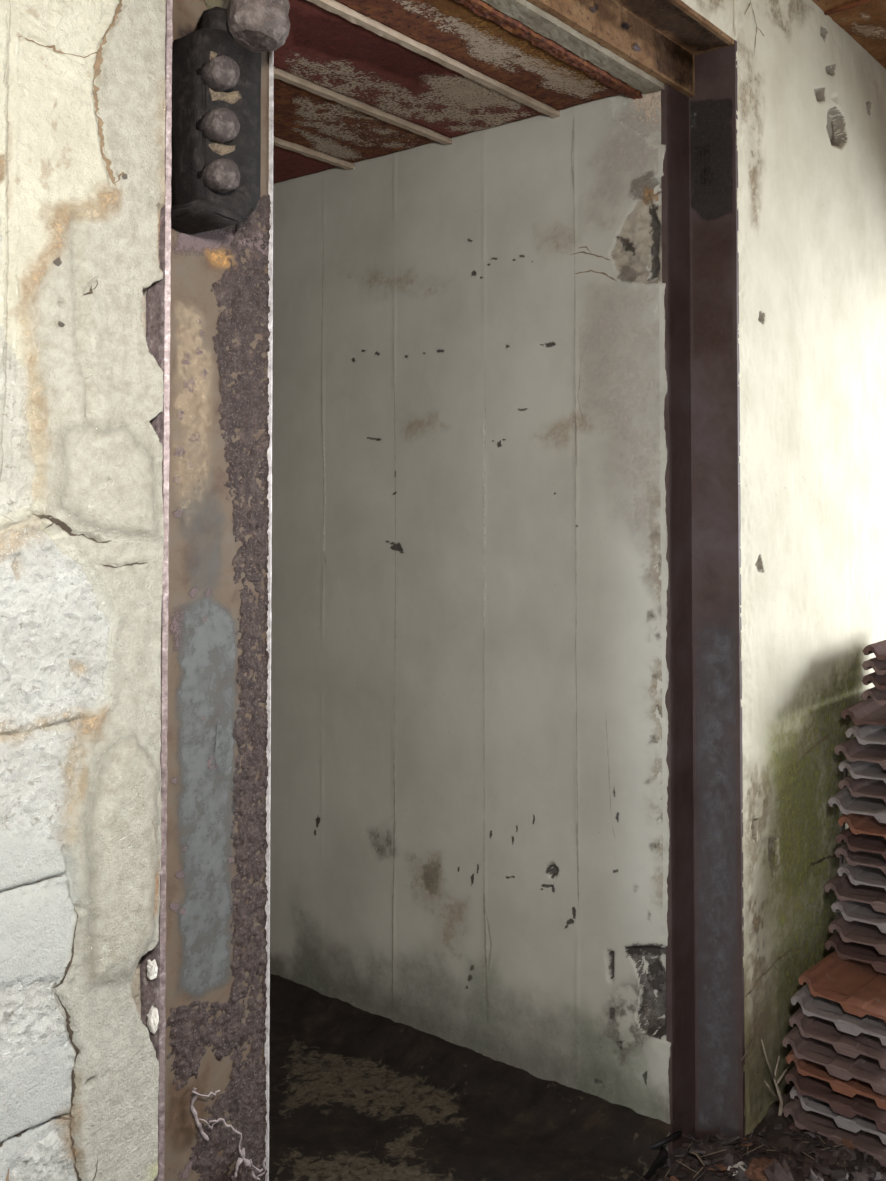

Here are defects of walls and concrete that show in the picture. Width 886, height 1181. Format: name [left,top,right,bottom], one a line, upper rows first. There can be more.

crack [18,0,125,186]
rust [433,1,604,88]
rust [579,0,728,85]
spalling [814,64,848,147]
rust [173,223,269,266]
spalling [611,172,662,284]
spalling [625,943,666,1040]
crack [0,907,98,1181]